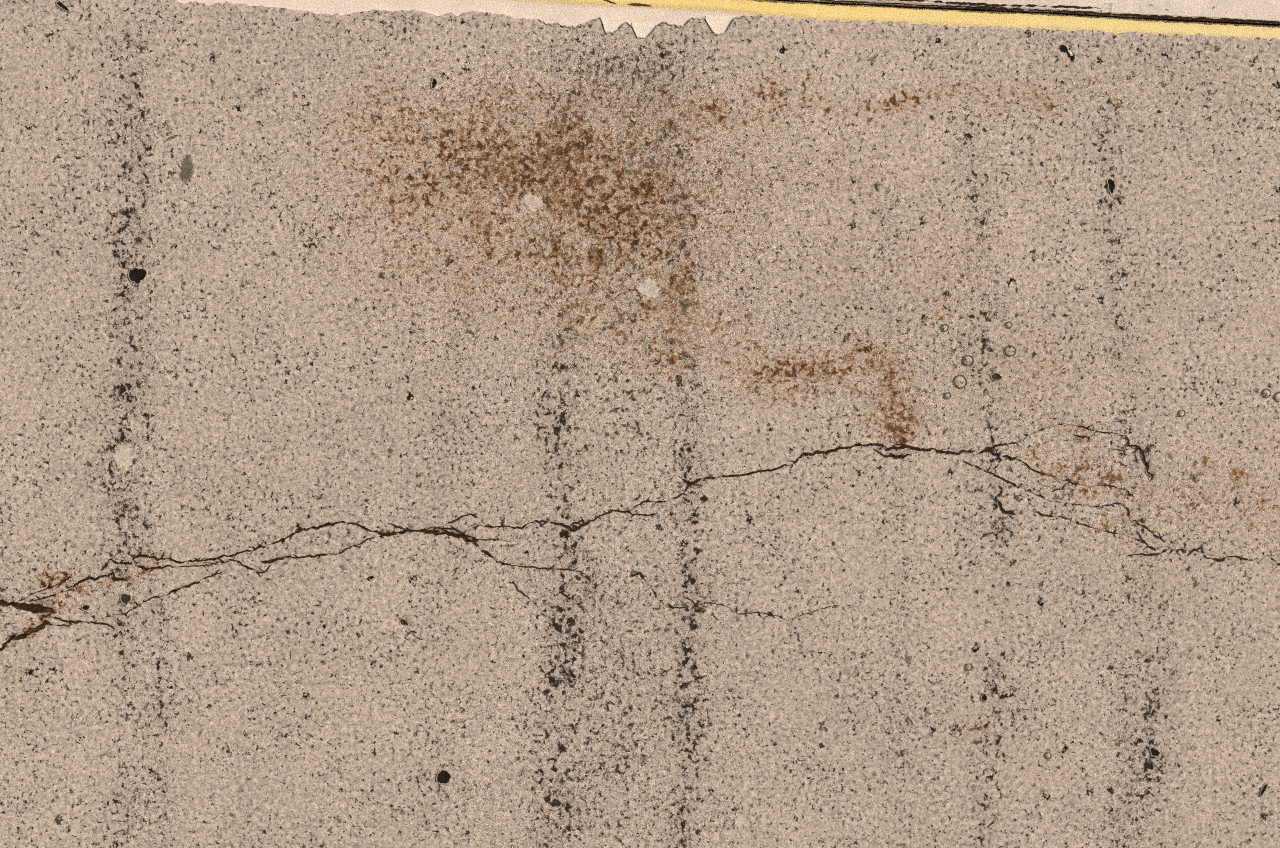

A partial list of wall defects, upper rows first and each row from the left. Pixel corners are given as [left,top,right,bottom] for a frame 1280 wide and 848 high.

crack [0,415,1280,651]
corrosion [307,56,1280,551]